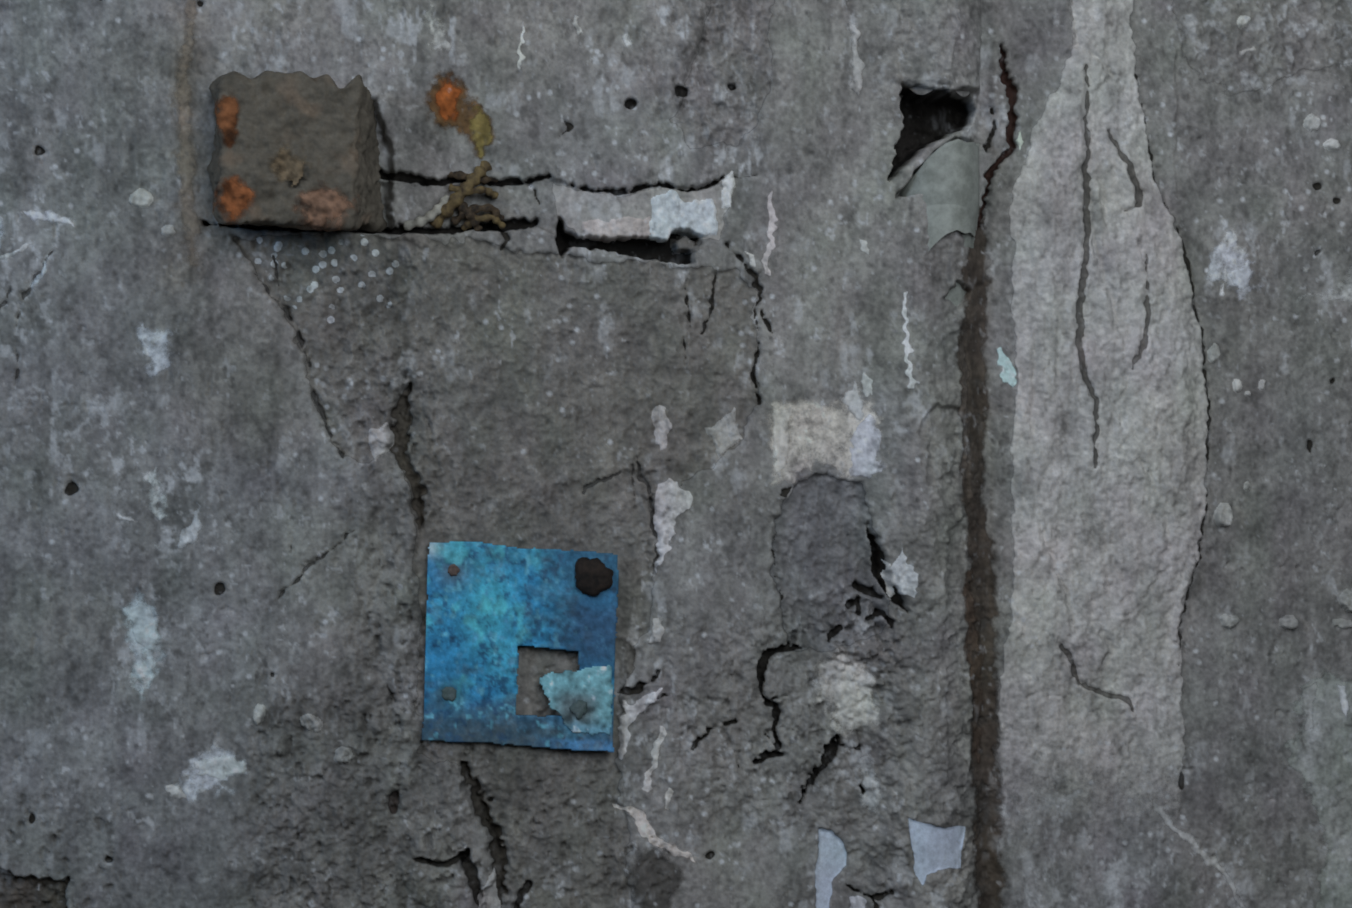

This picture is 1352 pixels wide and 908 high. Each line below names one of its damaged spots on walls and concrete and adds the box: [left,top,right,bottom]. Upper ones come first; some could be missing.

rust [426,71,494,158]
crack [562,121,574,135]
spalling [888,88,969,178]
crack [203,169,756,458]
crack [683,243,772,405]
crack [1135,74,1211,666]
crack [582,461,658,574]
crack [691,642,800,768]
crack [799,734,860,804]